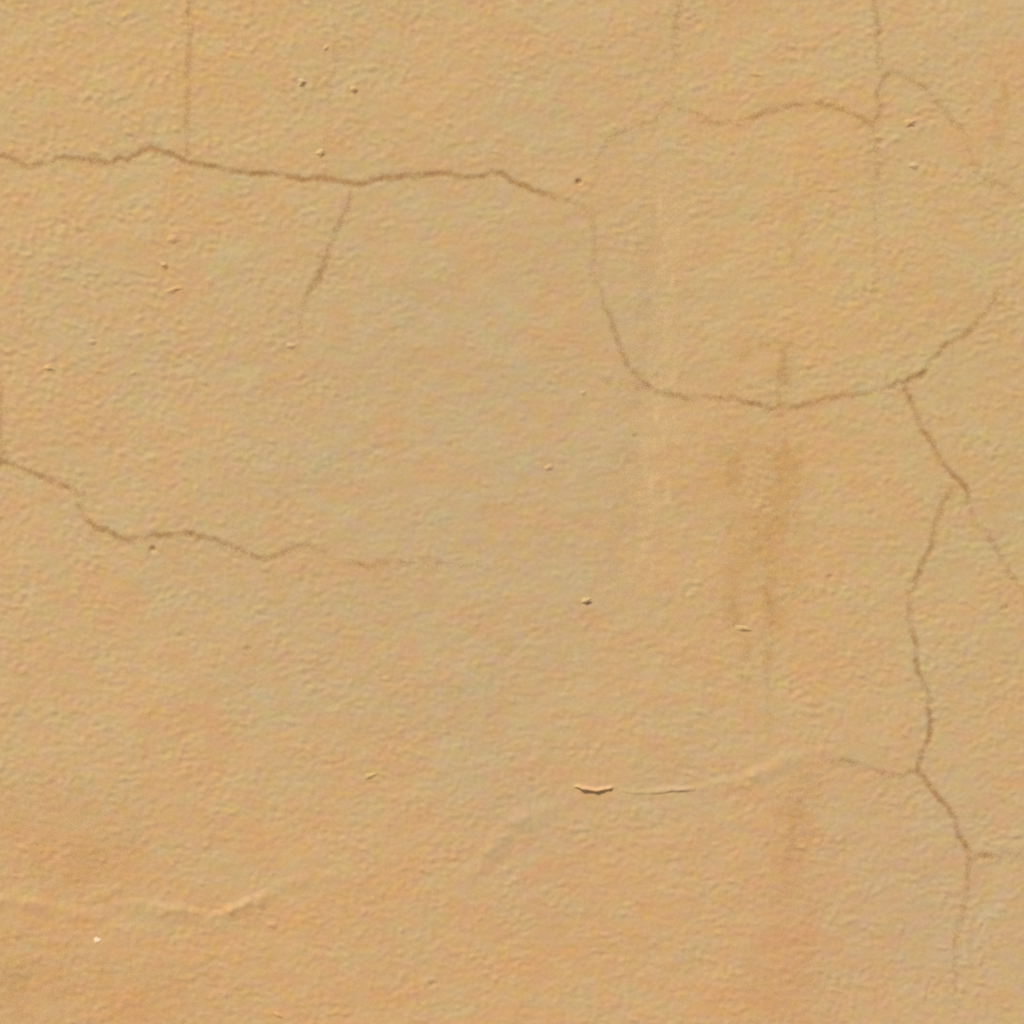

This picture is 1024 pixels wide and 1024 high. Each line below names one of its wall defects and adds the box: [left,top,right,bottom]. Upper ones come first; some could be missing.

crack [0,1,599,307]
crack [592,0,1024,292]
crack [0,458,491,572]
crack [597,283,1024,1012]